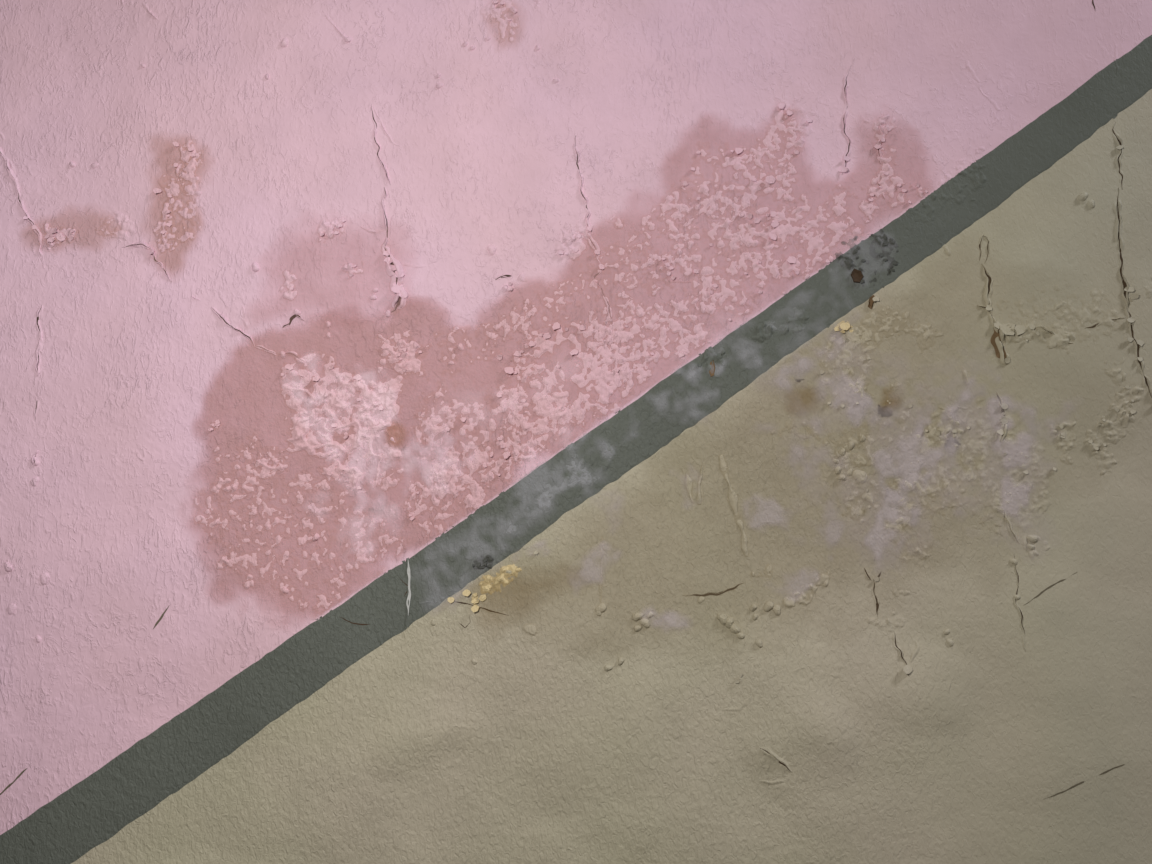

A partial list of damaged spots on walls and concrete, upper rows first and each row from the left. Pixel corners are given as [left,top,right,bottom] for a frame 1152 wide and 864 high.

crack [0,132,45,269]
crack [360,104,427,318]
crack [573,135,613,318]
crack [839,65,885,200]
crack [977,48,1152,400]
water stain [198,266,596,612]
peeling [191,93,987,621]
crack [960,366,1008,445]
peeling [1049,416,1127,475]